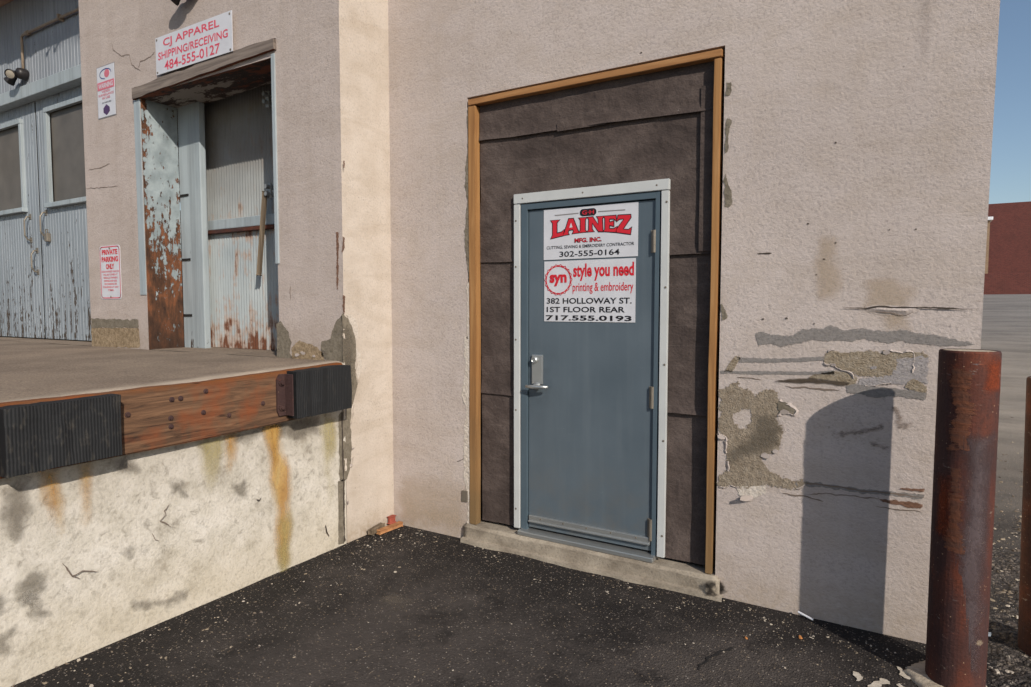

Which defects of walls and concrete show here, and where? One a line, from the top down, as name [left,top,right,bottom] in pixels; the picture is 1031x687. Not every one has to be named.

crack [857,304,963,312]
spalling [716,348,929,501]
corrosion [265,426,289,567]